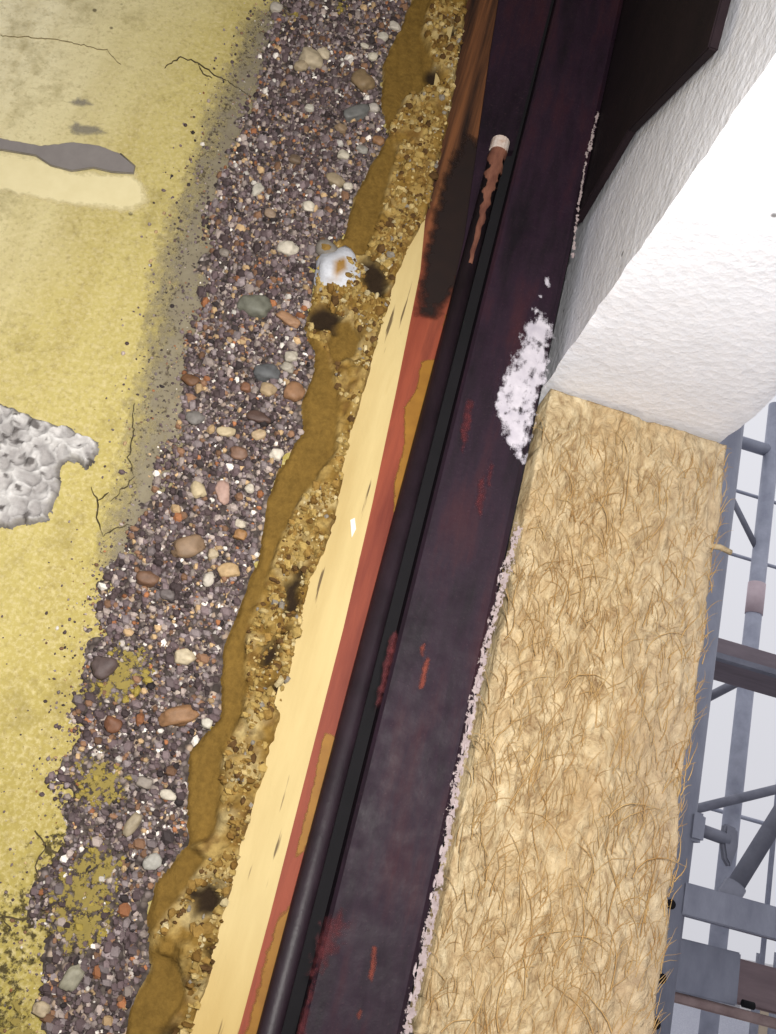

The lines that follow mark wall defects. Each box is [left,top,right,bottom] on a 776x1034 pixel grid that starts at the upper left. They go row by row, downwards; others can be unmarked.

crack [1,35,121,65]
crack [165,56,249,96]
rust [469,135,510,264]
flaking render [0,0,468,1034]